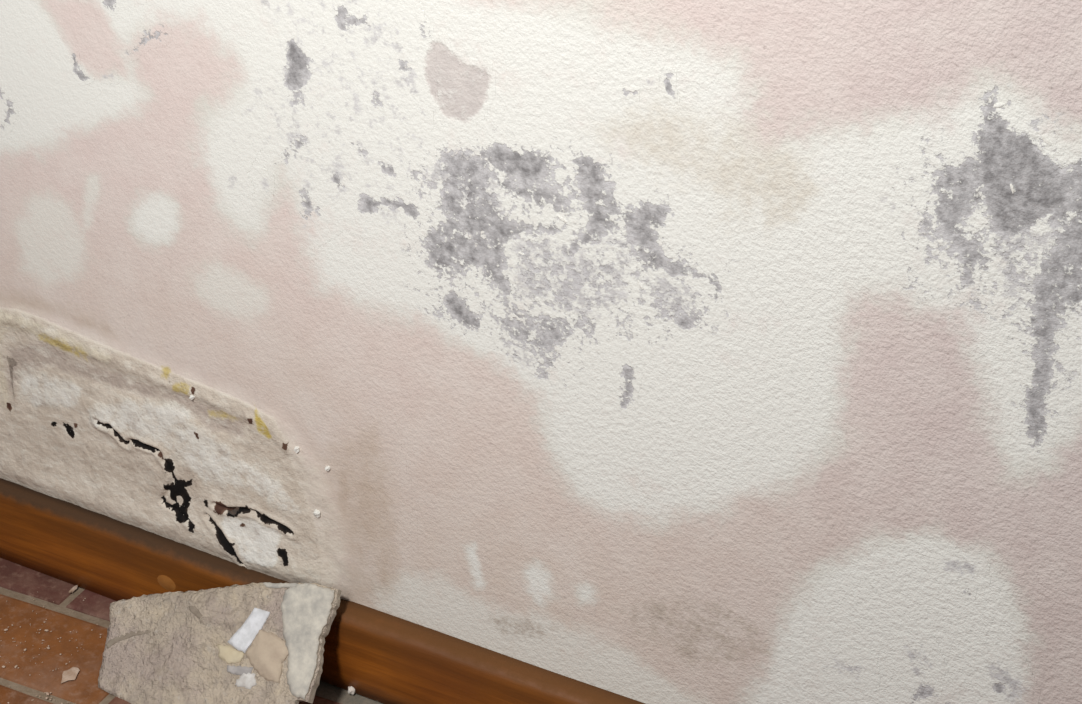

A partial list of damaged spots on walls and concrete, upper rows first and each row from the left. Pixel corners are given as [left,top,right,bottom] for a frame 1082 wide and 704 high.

crack [51,421,294,566]